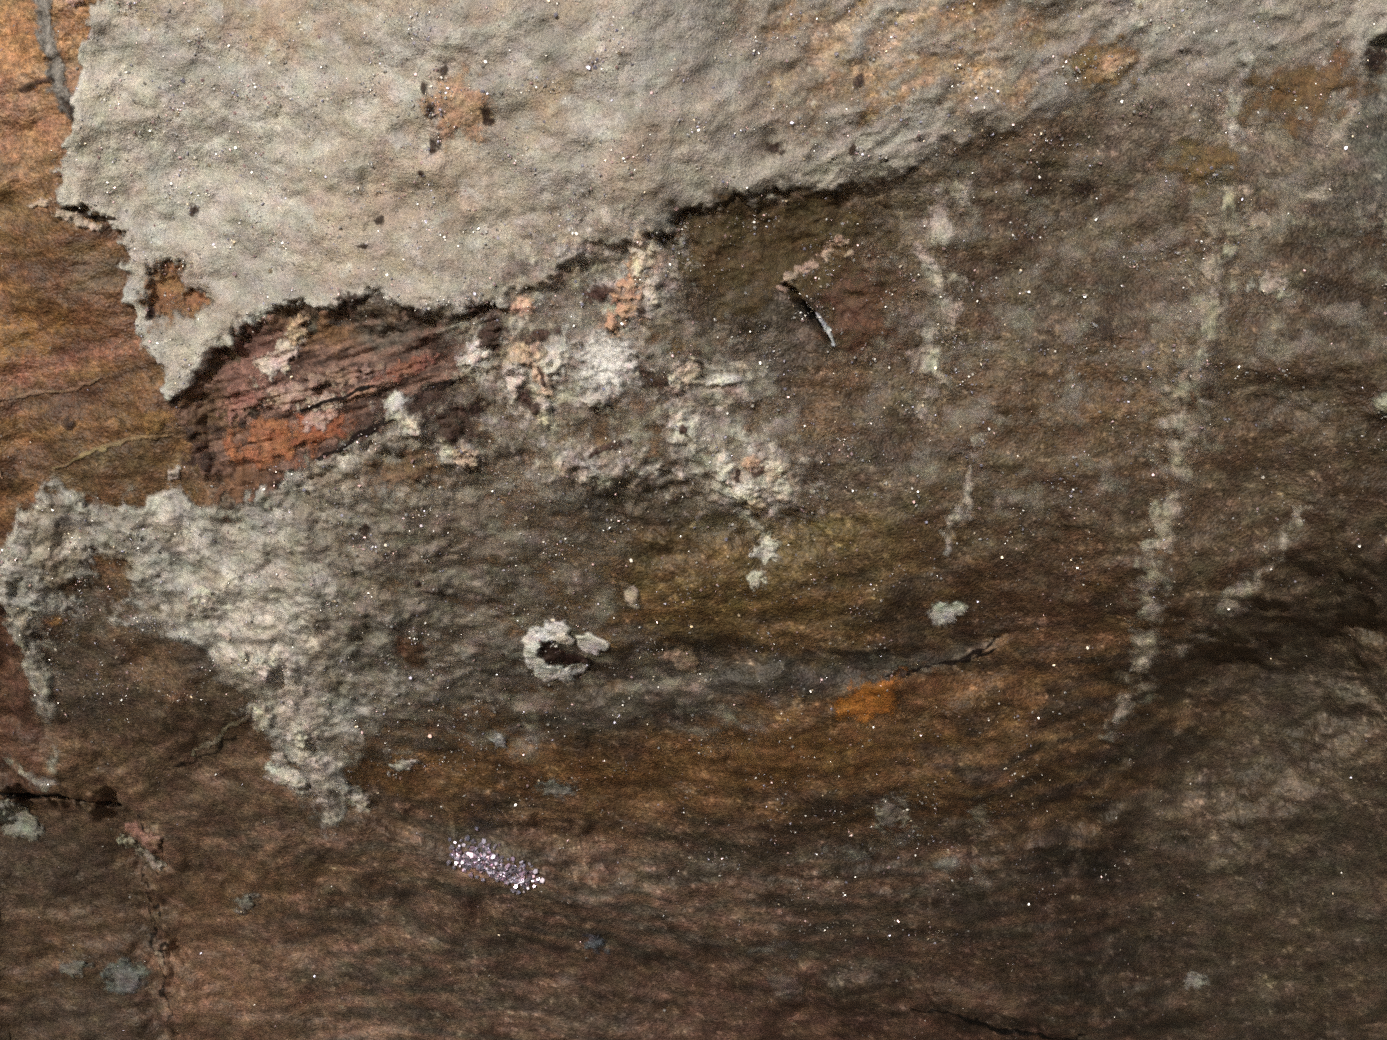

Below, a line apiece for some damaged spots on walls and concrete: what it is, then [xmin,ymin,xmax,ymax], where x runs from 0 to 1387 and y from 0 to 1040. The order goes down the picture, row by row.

water stain [0,384,609,838]
spalling [167,291,488,522]
water stain [53,0,1387,530]
water stain [940,439,978,556]
water stain [1102,185,1307,742]